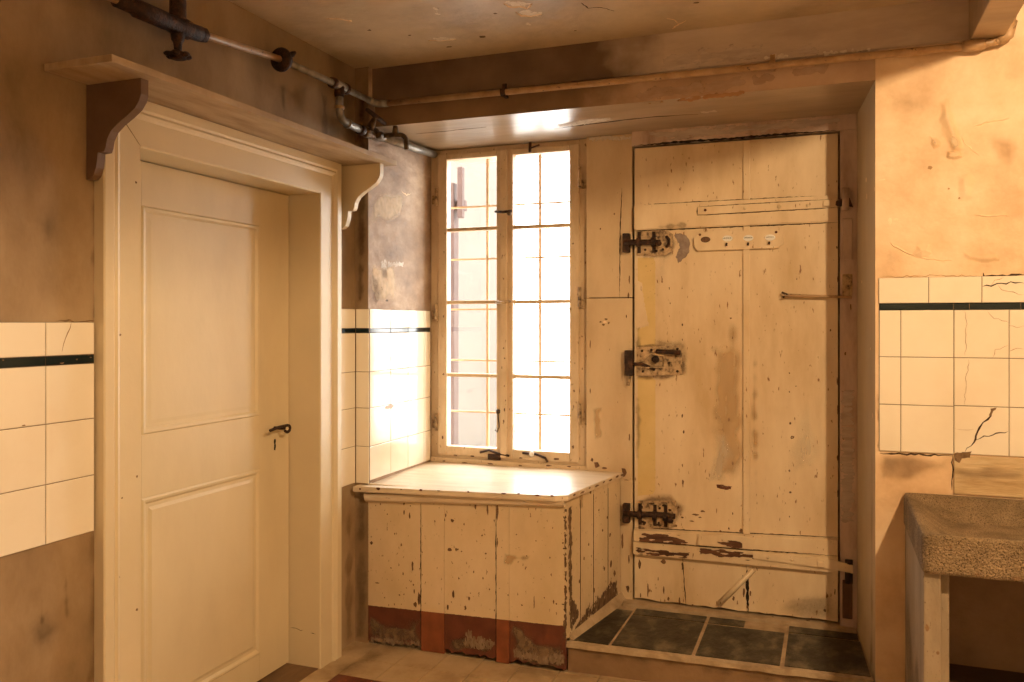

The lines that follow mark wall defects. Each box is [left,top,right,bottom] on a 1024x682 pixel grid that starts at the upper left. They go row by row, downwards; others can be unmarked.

crack [883,243,1023,295]
crack [59,319,94,350]
crack [880,408,1006,487]
flaking render [955,451,972,463]